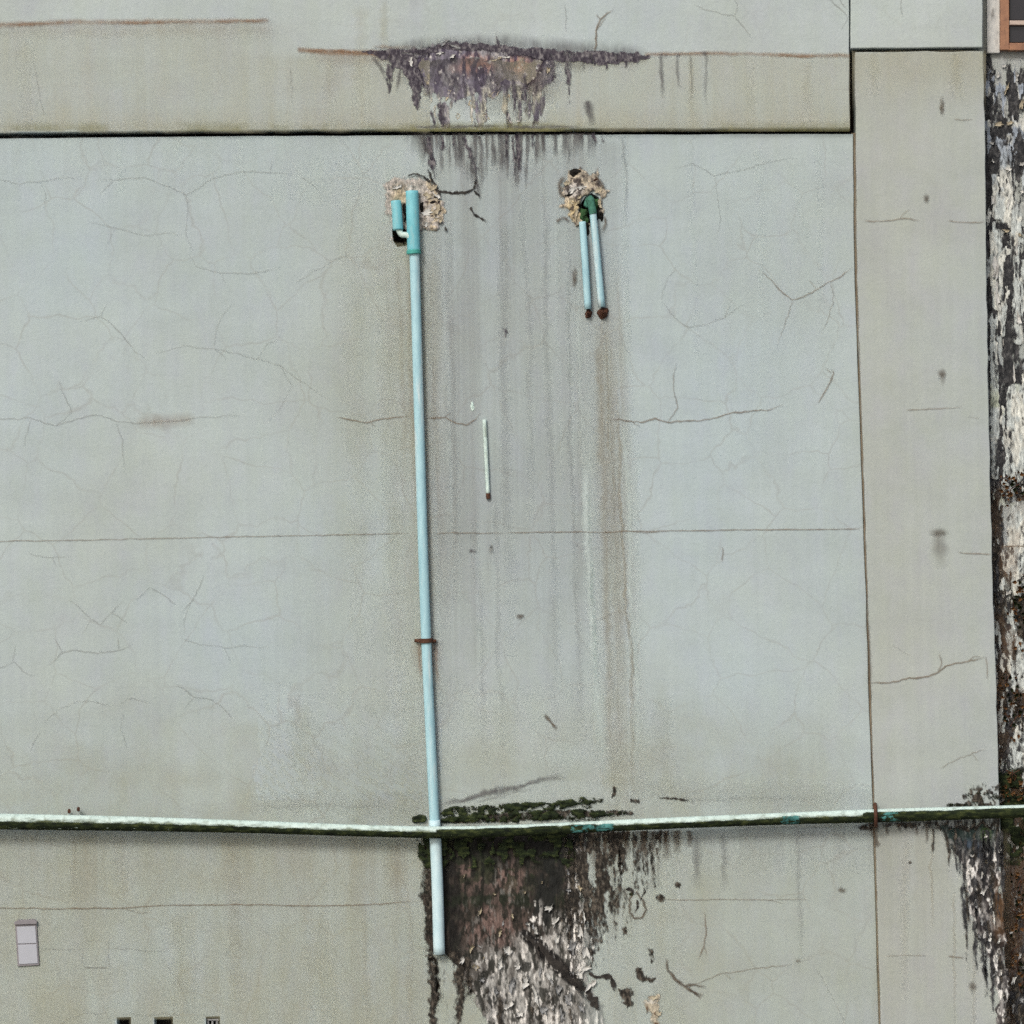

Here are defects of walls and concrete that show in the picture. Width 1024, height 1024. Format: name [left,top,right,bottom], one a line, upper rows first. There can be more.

water stain [362,37,650,110]
water stain [421,133,604,189]
spalling [383,173,447,231]
spalling [557,167,609,236]
water stain [984,51,1024,805]
peeling [985,65,1024,803]
crack [880,660,971,683]
water stain [440,809,633,824]
spalling [419,833,605,1024]
water stain [564,830,691,966]
water stain [859,817,1024,1024]
crack [666,963,698,996]